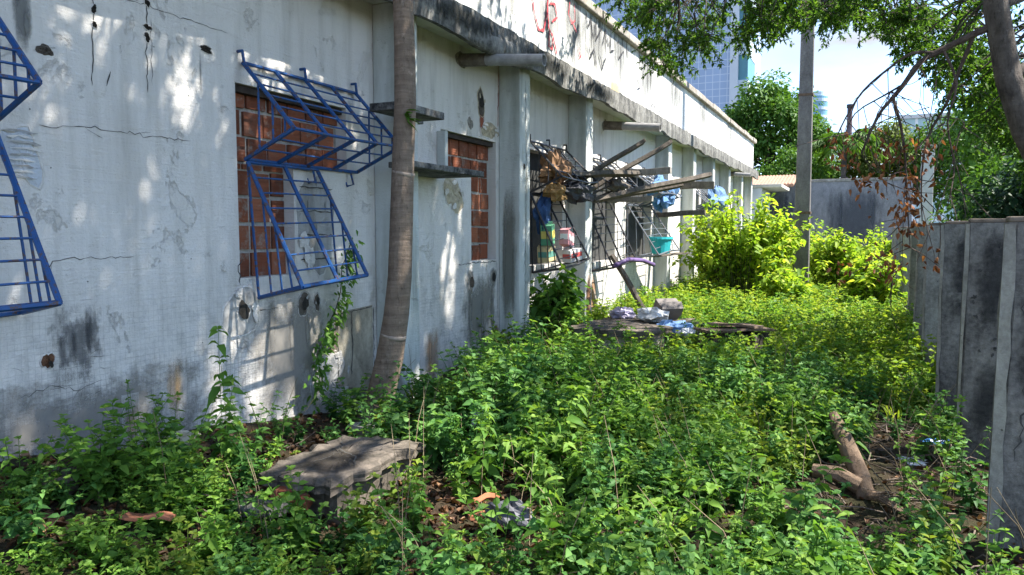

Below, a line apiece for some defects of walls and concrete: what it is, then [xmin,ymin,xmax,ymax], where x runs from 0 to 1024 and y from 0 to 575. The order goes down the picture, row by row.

spalling [35,43,54,56]
crack [91,0,111,85]
crack [129,0,226,91]
spalling [199,44,213,55]
crack [41,125,187,141]
crack [50,256,128,268]
spalling [220,258,278,340]
spalling [297,290,320,317]
spalling [39,352,56,370]
water stain [60,322,98,374]